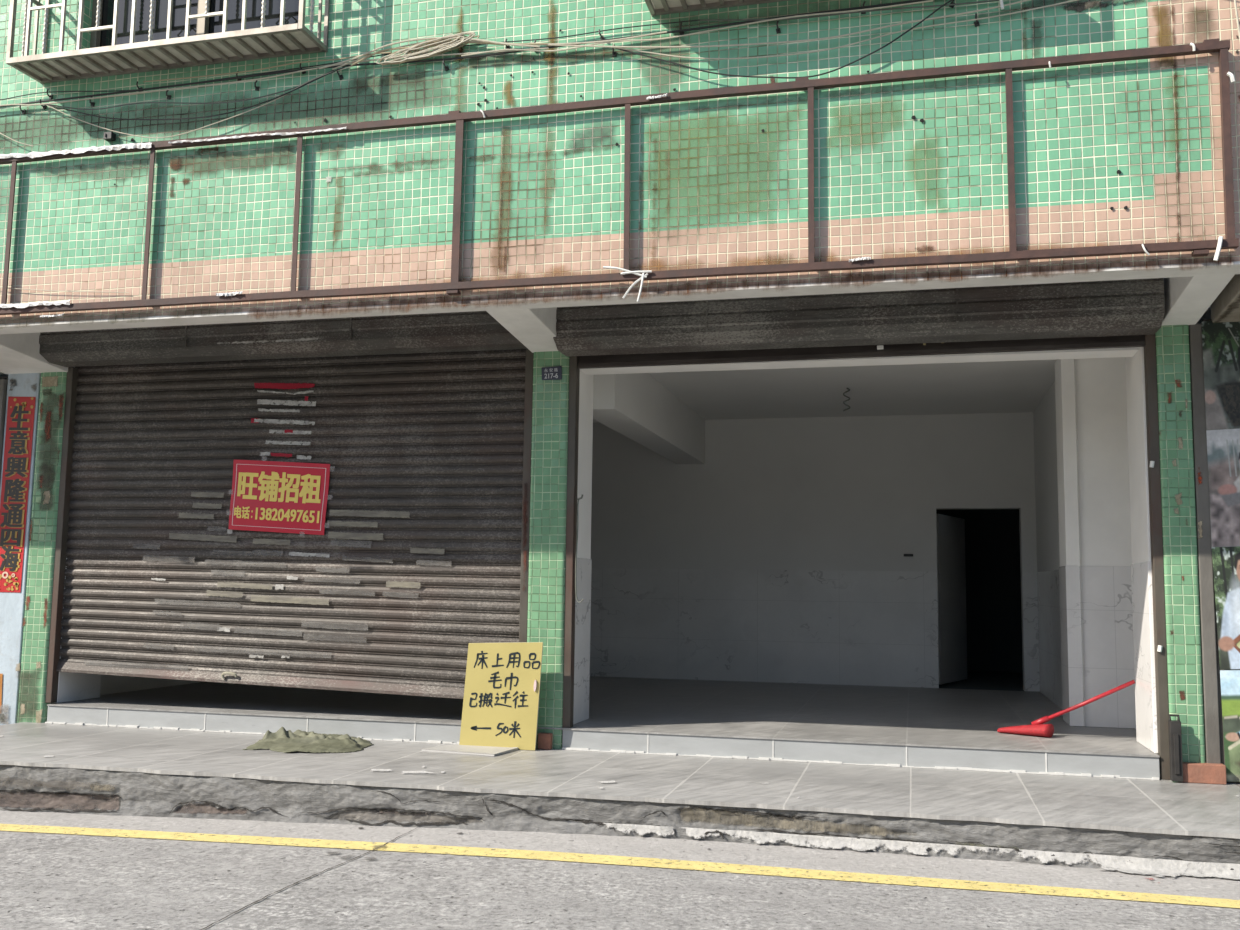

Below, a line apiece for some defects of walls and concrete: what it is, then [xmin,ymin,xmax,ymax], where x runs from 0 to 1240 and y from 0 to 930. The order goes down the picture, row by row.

corrosion [545,1,556,105]
corrosion [1154,7,1178,120]
corrosion [504,81,514,105]
damp [646,108,789,240]
damp [471,145,546,253]
corrosion [251,131,1234,319]
corrosion [0,313,155,326]
corrosion [173,308,234,317]
spalling [0,777,121,812]
spalling [169,800,483,826]
spalling [670,804,924,843]